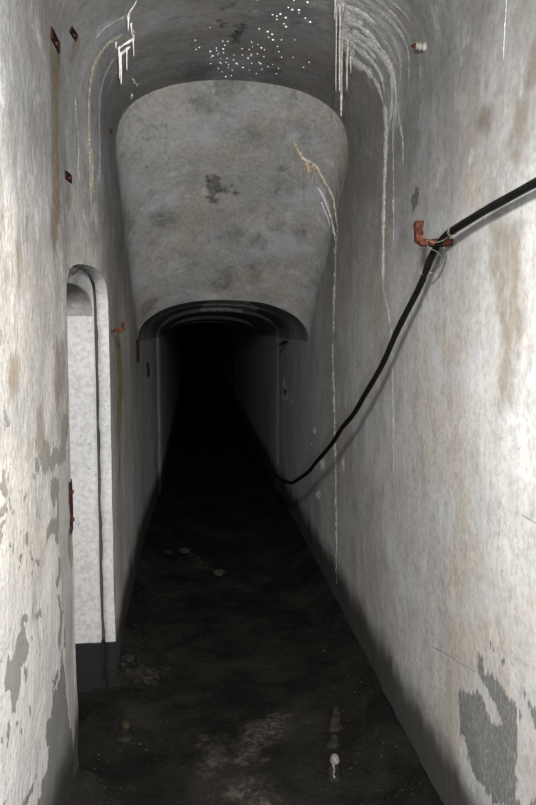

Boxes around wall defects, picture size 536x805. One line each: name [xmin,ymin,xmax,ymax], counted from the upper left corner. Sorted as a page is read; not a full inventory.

water stain [88,1,137,198]
water stain [293,142,337,262]
water stain [342,0,409,337]
peeling [0,469,27,547]
peeling [34,412,69,544]
peeling [1,608,42,748]
peeling [23,556,74,805]
peeling [459,653,536,805]